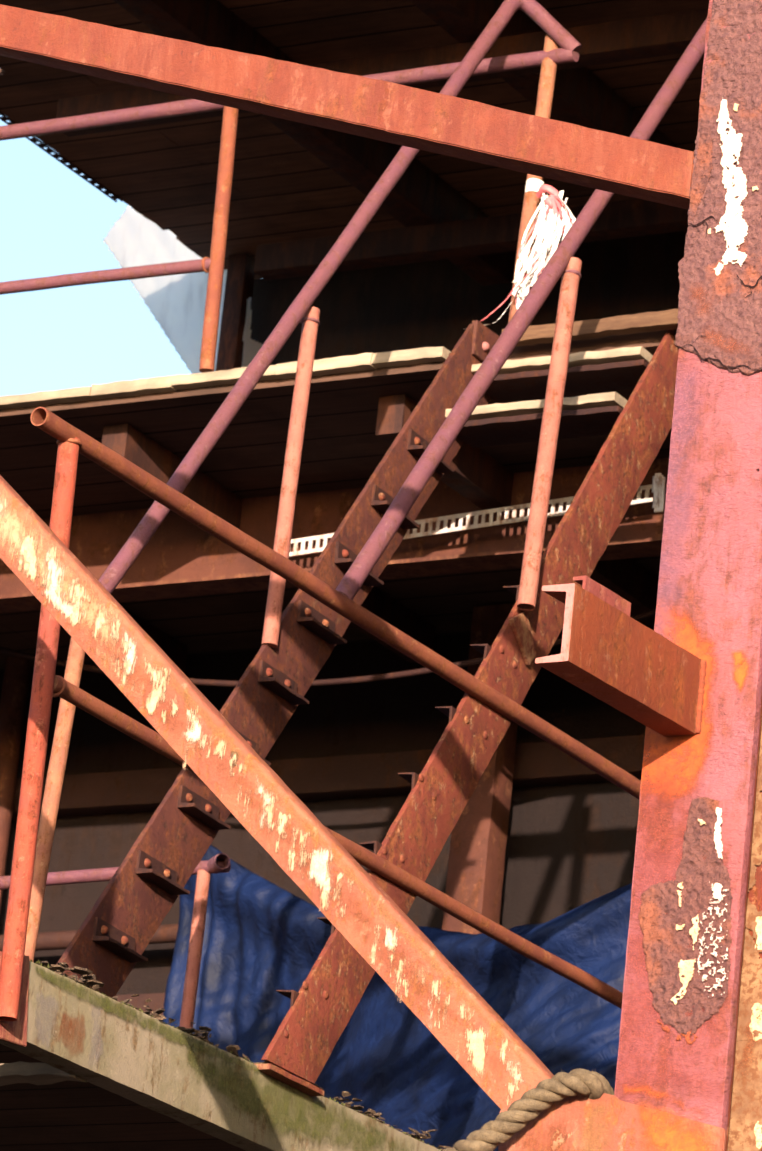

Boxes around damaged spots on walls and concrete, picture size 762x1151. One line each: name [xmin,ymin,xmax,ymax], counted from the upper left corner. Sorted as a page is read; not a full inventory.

peeling [675,97,762,375]
peeling [0,490,354,917]
rust [640,603,715,799]
rust [733,651,748,691]
peeling [369,924,523,1105]
peeling [670,719,762,1151]